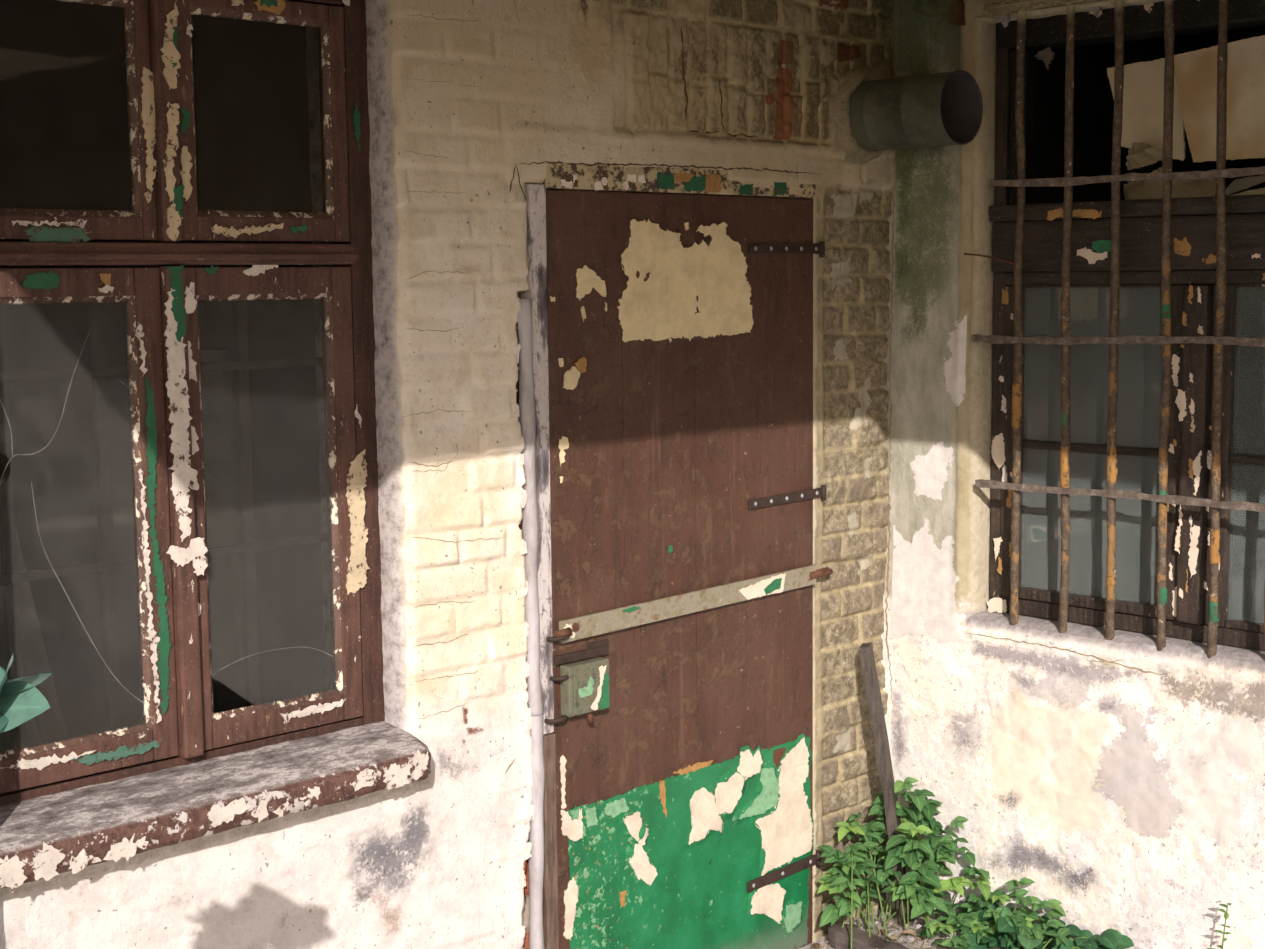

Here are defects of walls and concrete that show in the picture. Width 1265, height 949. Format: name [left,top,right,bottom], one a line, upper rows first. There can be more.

peeling [723,0,862,140]
crack [510,26,819,206]
peeling [942,314,967,406]
peeling [909,441,955,501]
peeling [890,517,963,645]
peeling [987,597,1007,613]
peeling [993,537,1011,574]
peeling [1106,574,1116,587]
leakage [359,809,428,887]